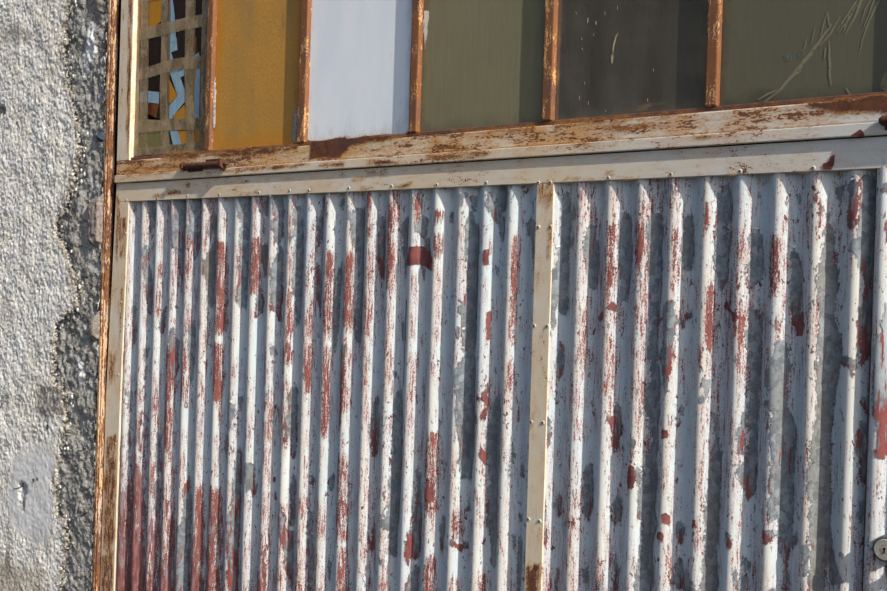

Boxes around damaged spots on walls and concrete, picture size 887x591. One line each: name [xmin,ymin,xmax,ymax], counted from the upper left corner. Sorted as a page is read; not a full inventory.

rust [554,113,669,139]
rust [806,94,887,114]
rust [125,134,406,175]
flaking render [52,0,108,591]
peeling [116,185,536,591]
peeling [550,172,887,591]
rust [101,434,117,591]
peeling [544,495,562,546]
rust [525,564,540,591]